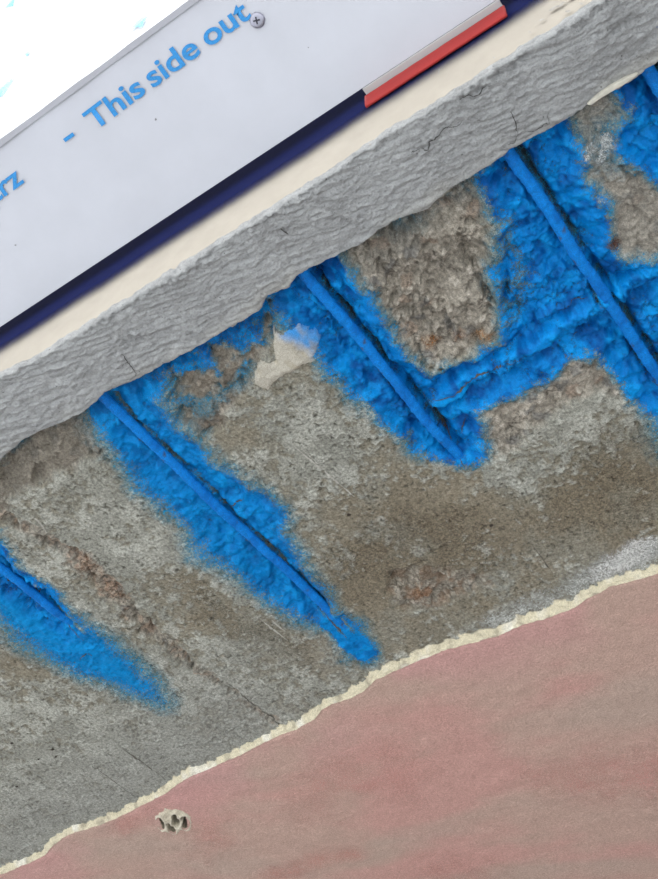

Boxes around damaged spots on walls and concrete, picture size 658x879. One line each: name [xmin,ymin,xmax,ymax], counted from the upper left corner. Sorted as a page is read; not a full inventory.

crack [408,123,461,156]
spalling [0,62,658,685]
spalling [0,539,658,875]